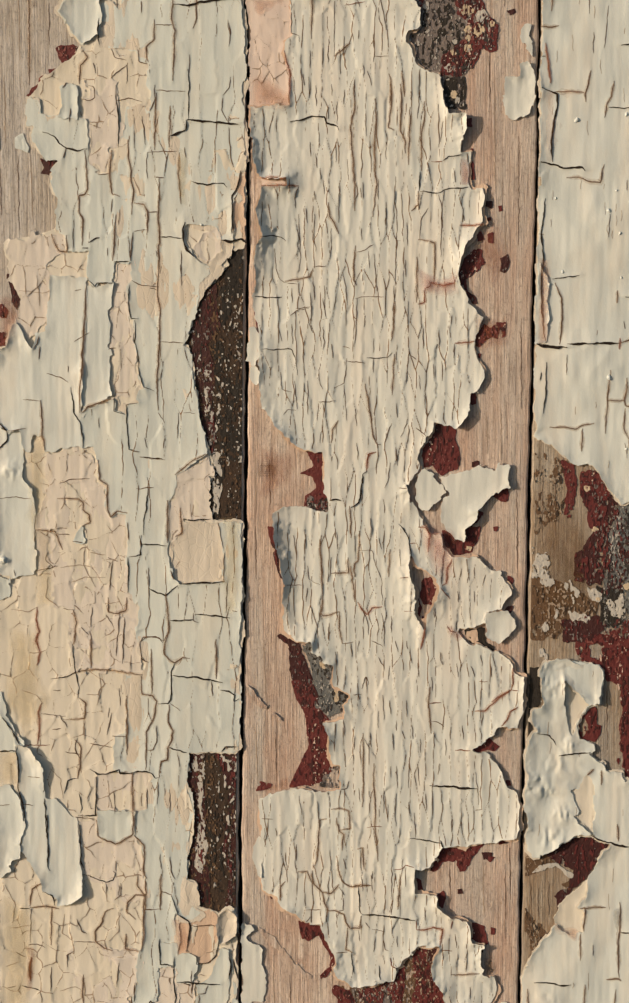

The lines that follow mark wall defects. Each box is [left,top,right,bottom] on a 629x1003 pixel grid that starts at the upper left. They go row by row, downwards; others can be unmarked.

peeling [15,133,29,153]
peeling [204,288,260,516]
peeling [415,462,511,542]
crack [516,466,556,569]
peeling [484,610,516,644]
peeling [532,547,625,632]
peeling [192,754,237,877]
peeling [252,836,264,878]
crack [527,825,629,1003]